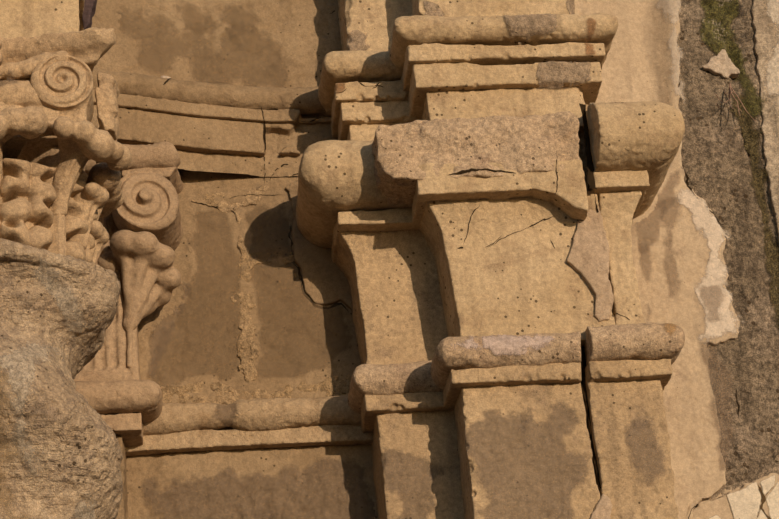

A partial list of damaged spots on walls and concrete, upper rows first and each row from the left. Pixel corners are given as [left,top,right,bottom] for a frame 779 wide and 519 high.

crack [192,106,353,313]
crack [449,167,514,175]
crack [485,216,553,248]
peeling [678,189,740,341]
crack [581,346,608,519]
peeling [692,473,779,519]